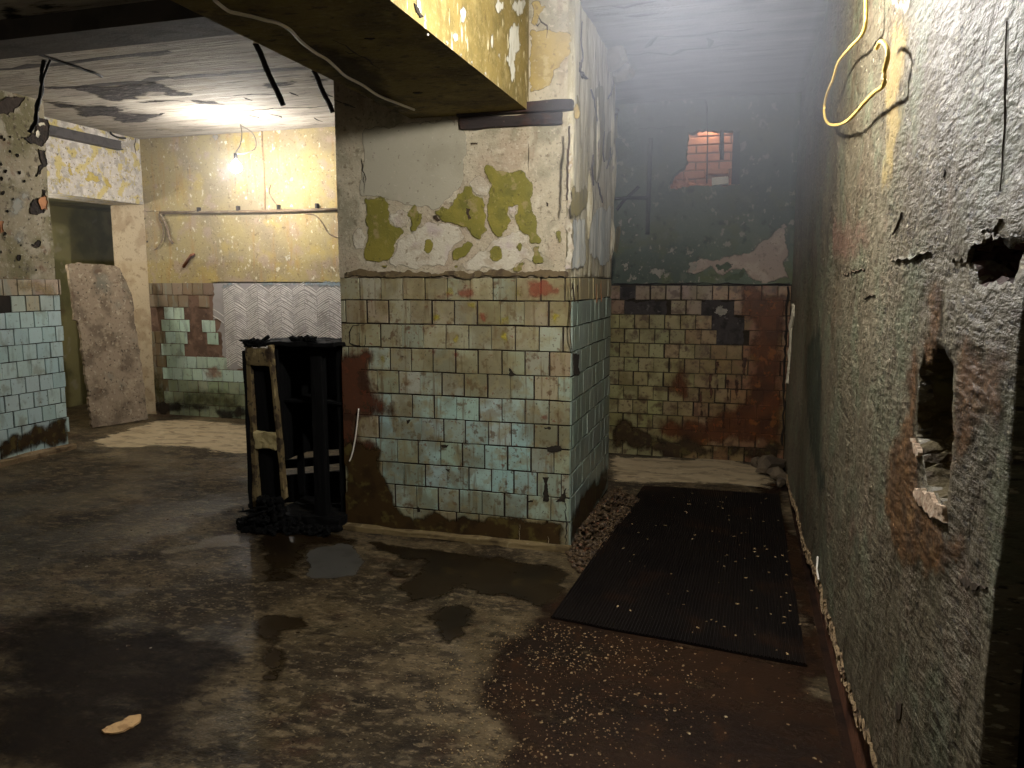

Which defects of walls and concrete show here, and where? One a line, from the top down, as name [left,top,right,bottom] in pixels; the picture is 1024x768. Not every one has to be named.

peeling [491,0,571,92]
spalling [0,118,73,261]
peeling [346,81,674,316]
peeling [688,224,788,283]
spalling [950,218,1024,287]
damp [0,418,68,459]
damp [94,419,247,453]
rust [341,350,394,449]
damp [344,419,787,544]
peeling [699,296,745,345]
rust [660,286,786,447]
spalling [910,347,955,523]